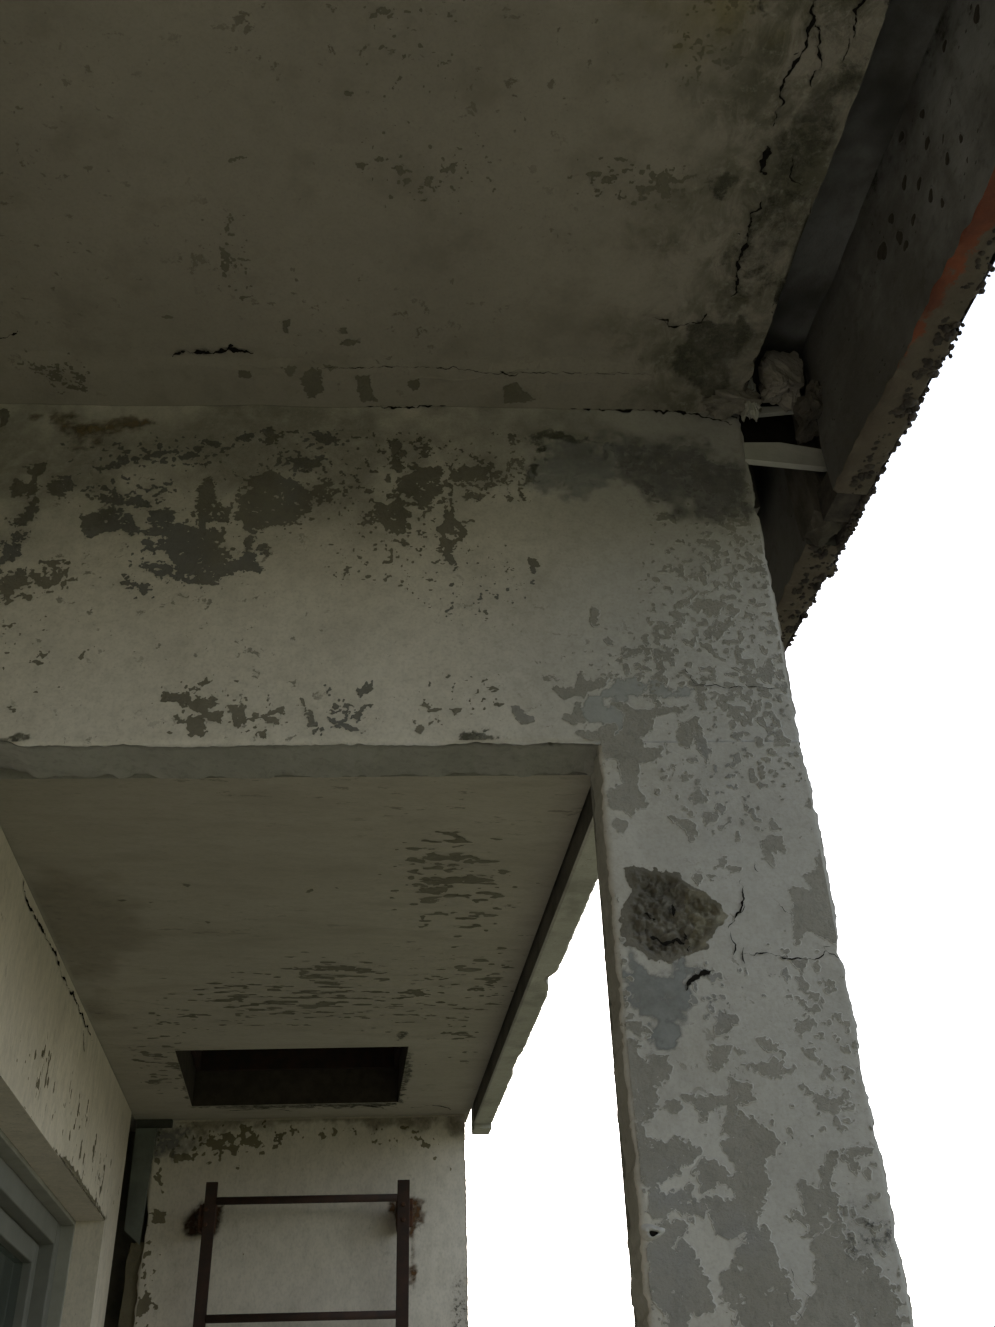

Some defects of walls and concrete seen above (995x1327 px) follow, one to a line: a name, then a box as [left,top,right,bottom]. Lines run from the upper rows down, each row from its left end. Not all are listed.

crack [654,0,866,328]
crack [172,344,253,357]
water stain [672,316,752,403]
peeling [0,426,540,621]
peeling [146,677,377,740]
peeling [378,831,517,948]
peeling [552,485,910,1327]
crack [686,865,841,991]
peeling [131,947,514,1094]
peeling [153,1120,439,1194]
corrosion [184,1205,224,1236]
corrosion [409,1199,424,1237]